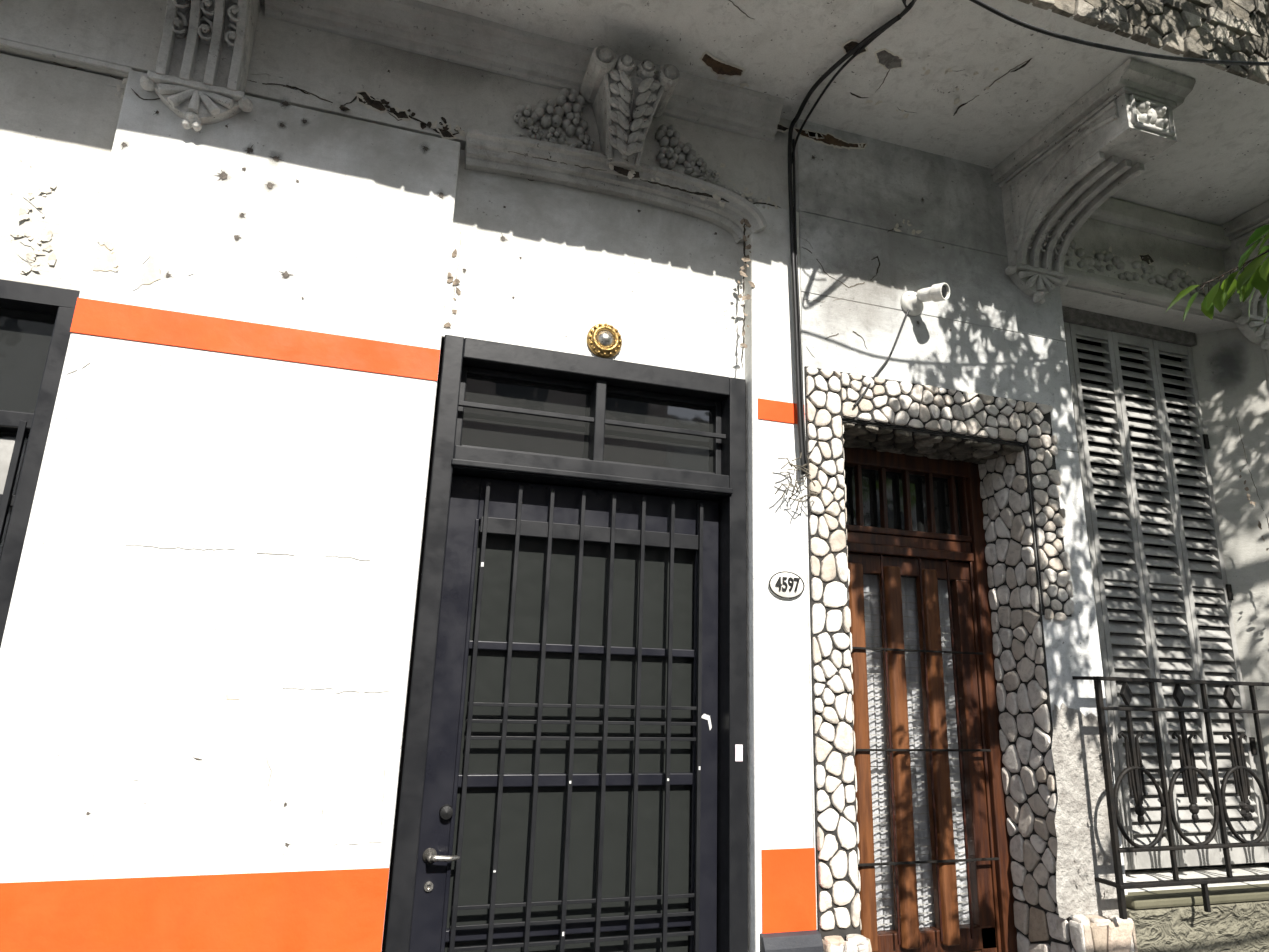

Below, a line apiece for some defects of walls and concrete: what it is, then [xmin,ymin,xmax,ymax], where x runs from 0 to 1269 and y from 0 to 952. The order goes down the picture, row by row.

crack [249,73,333,103]
spalling [699,52,749,88]
spalling [841,39,903,105]
peeling [945,58,1032,116]
spalling [339,91,466,140]
spalling [777,123,867,150]
crack [128,545,295,556]